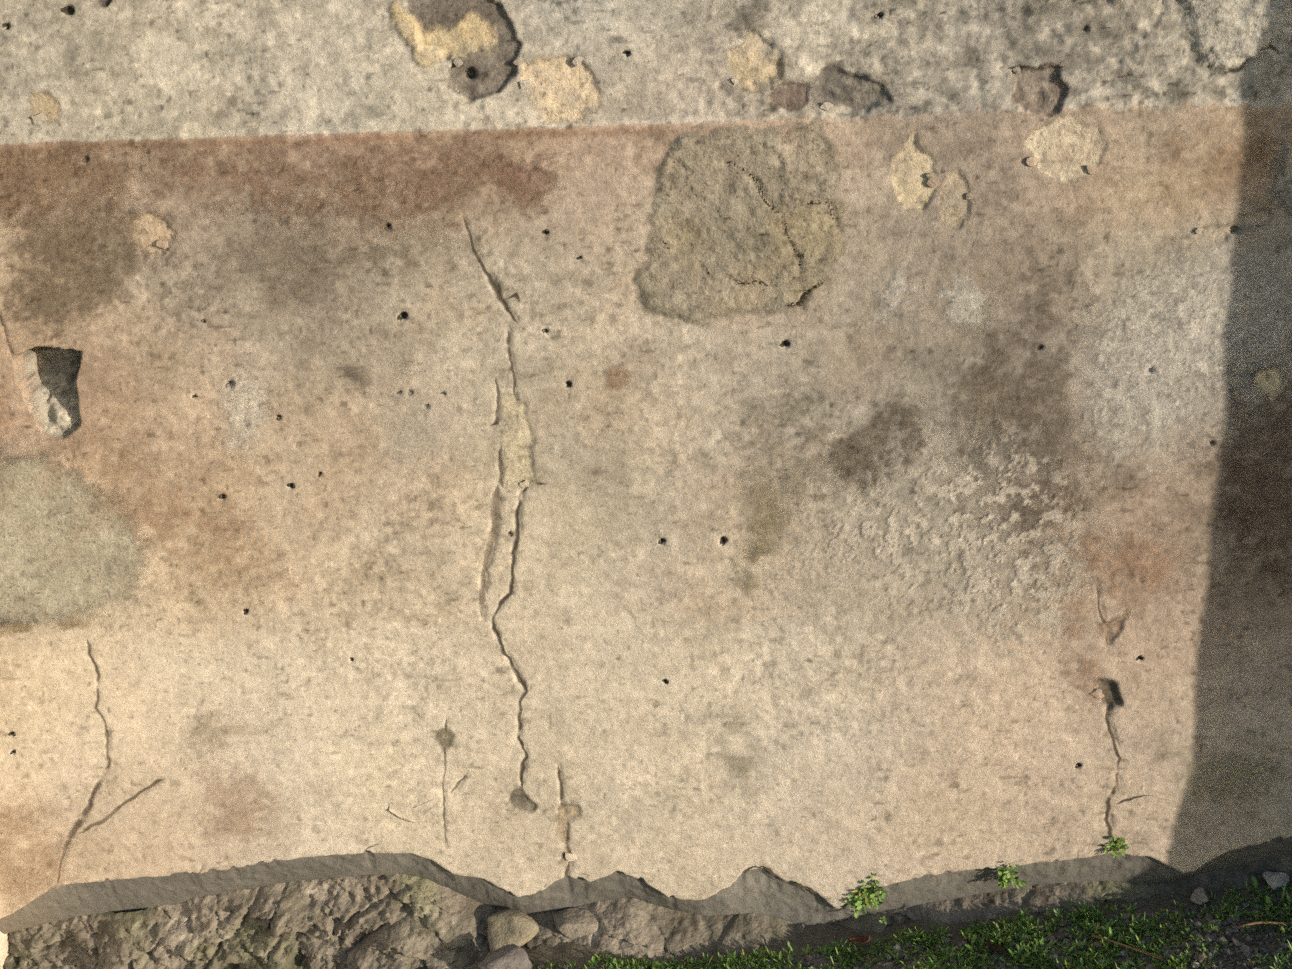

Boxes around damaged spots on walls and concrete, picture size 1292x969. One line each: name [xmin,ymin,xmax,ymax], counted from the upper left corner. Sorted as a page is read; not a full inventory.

flaking render [391,0,602,124]
damp [7,210,137,325]
damp [1095,249,1292,460]
crack [464,218,546,792]
damp [1207,381,1292,575]
crack [1097,586,1108,644]
crack [58,639,164,885]
crack [556,765,564,806]
crack [1105,705,1148,840]